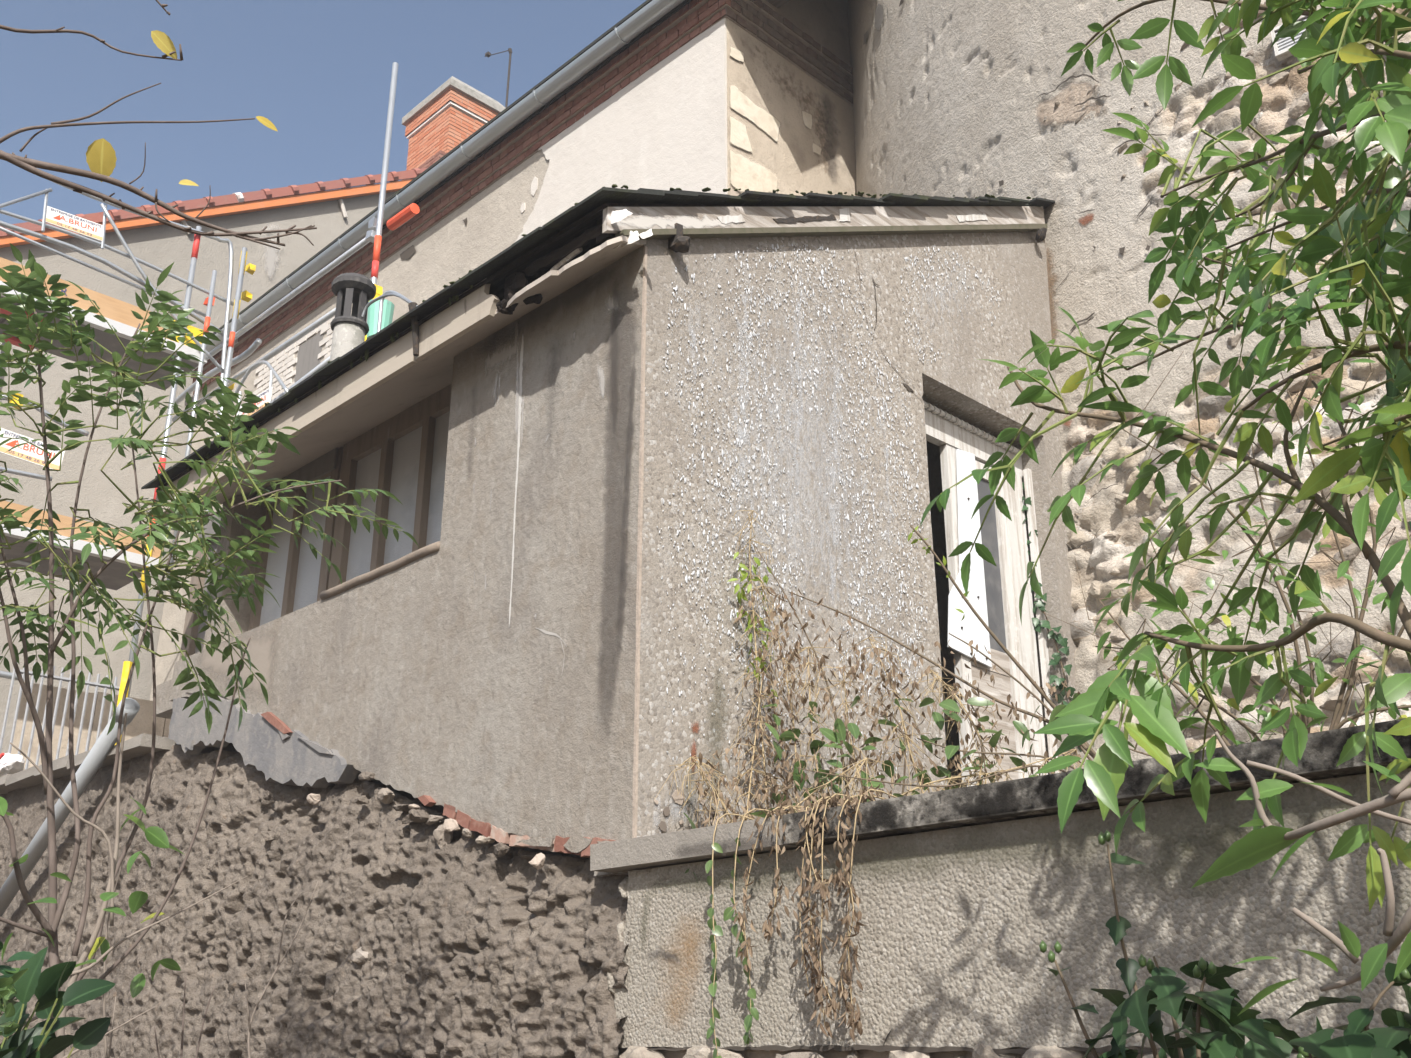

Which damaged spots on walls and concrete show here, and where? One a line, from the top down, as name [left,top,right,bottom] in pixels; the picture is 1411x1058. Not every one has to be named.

spalling [1036,74,1111,125]
peeling [261,712,334,755]
leakage [1314,731,1411,761]
leakage [1121,748,1281,794]
leakage [806,774,1063,839]